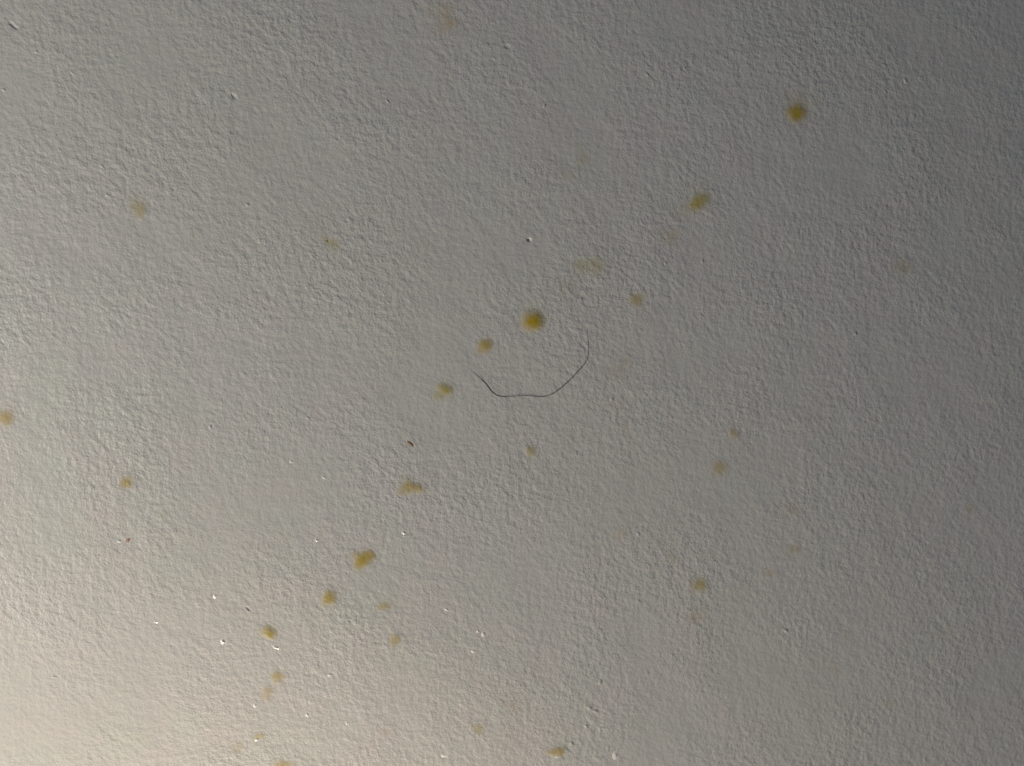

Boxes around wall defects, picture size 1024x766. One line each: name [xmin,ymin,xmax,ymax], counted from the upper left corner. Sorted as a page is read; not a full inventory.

water stain [508,298,552,336]
water stain [349,546,379,574]
water stain [318,586,341,610]
water stain [255,621,282,643]